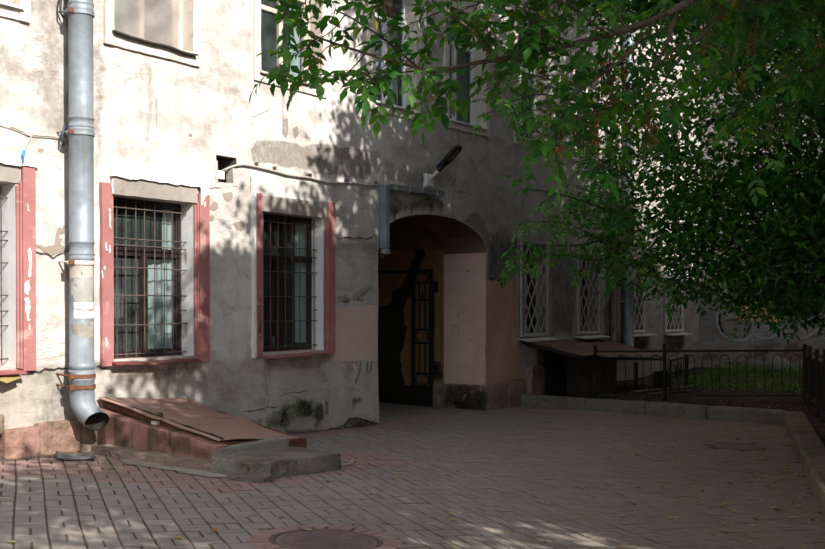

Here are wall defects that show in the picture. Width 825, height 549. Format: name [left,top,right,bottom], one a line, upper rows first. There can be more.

spalling [200,155,238,221]
flaking render [24,225,69,329]
crack [241,368,309,413]